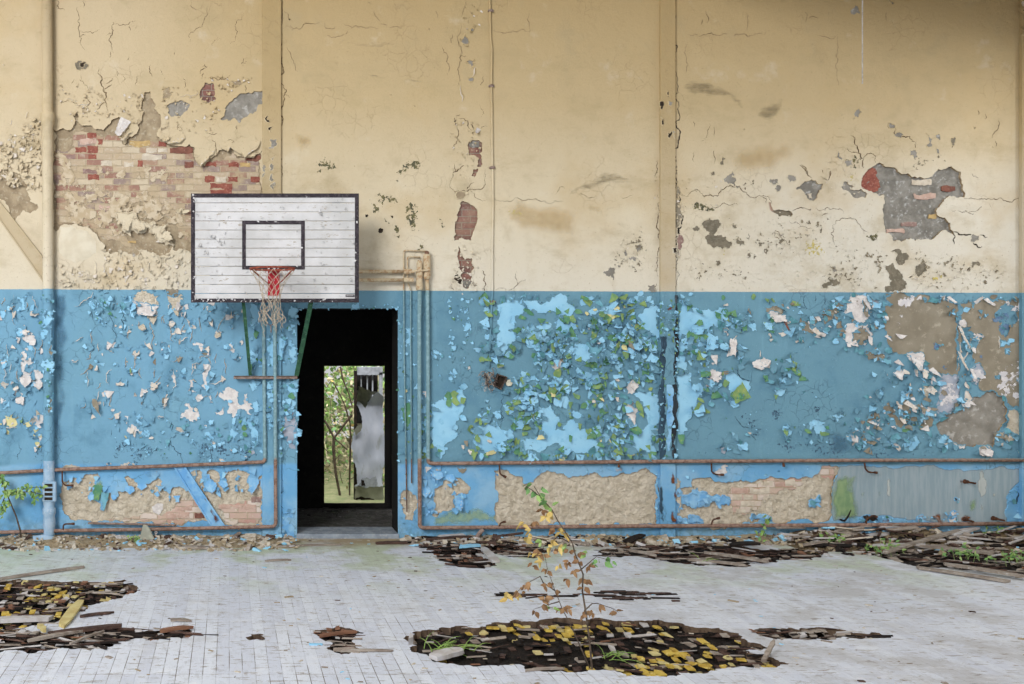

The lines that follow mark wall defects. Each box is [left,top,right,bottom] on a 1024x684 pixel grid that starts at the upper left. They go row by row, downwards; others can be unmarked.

crack [56,1,247,110]
peeling [0,74,1022,538]
crack [436,5,594,204]
crack [655,14,867,293]
crack [953,174,1018,248]